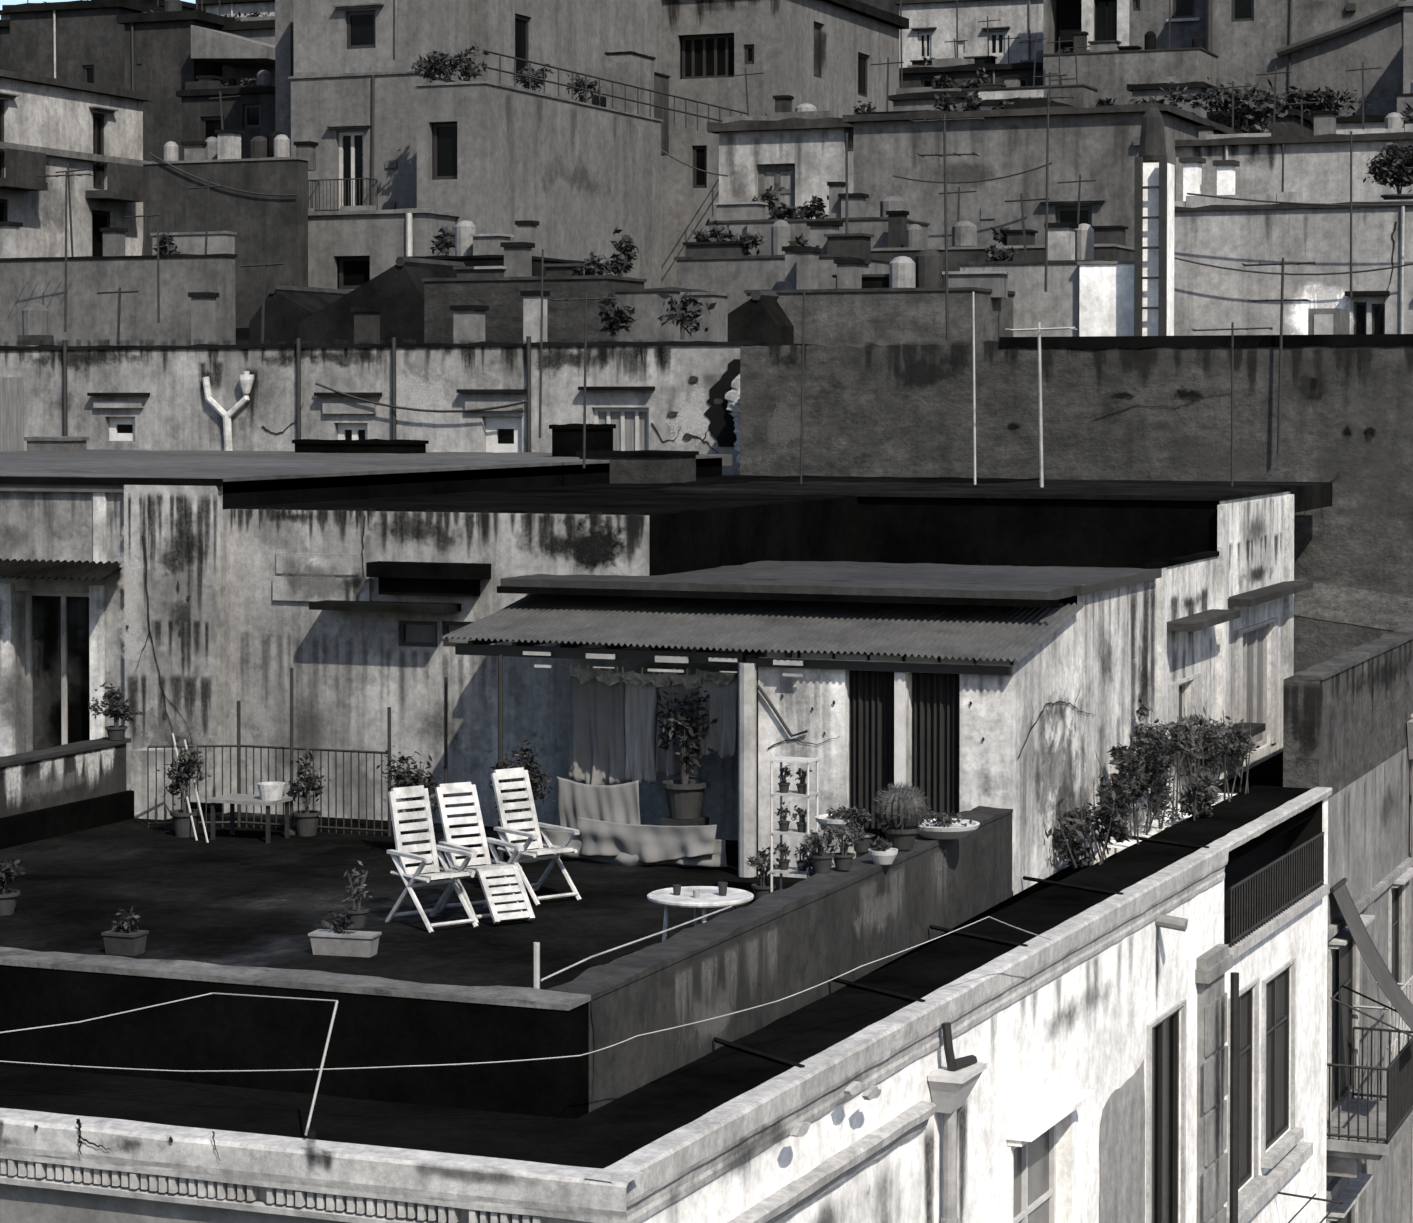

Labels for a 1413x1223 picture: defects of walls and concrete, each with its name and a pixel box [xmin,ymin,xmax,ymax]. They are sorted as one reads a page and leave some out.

damp [890,341,1018,386]
damp [1043,348,1256,385]
damp [128,495,644,730]
damp [1131,589,1155,727]
damp [1172,590,1207,637]
damp [0,676,113,799]
damp [676,931,777,1035]
crack [76,1119,110,1155]